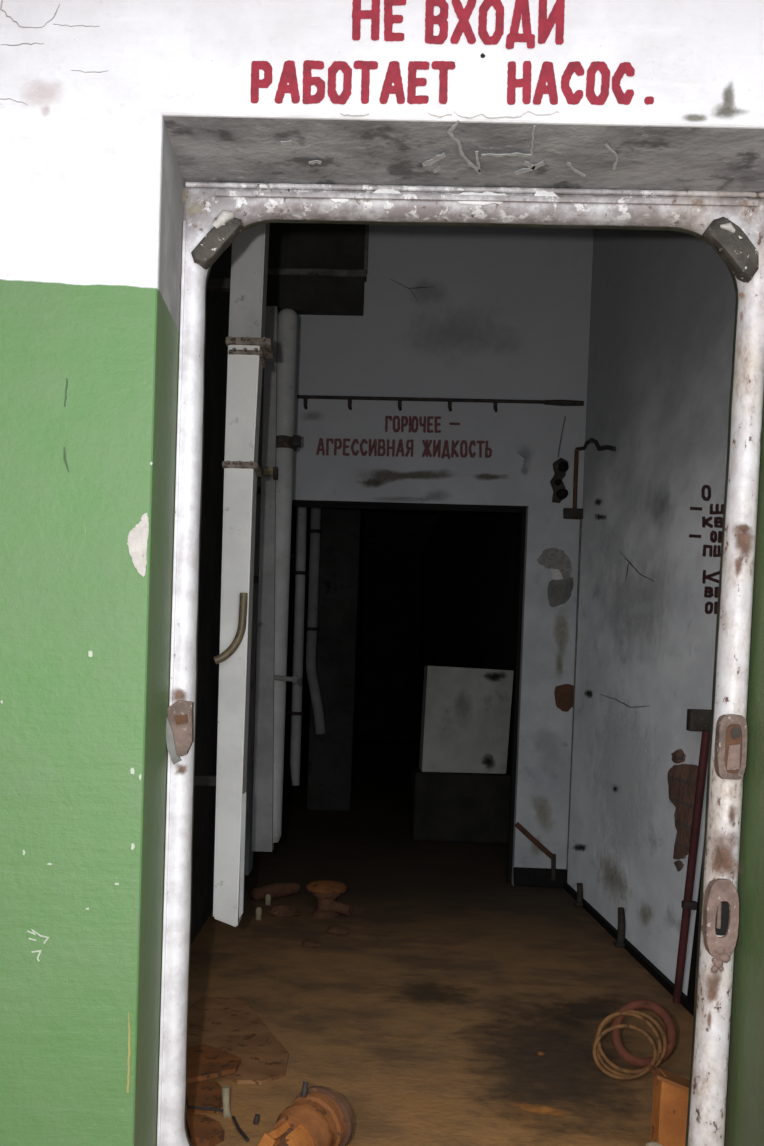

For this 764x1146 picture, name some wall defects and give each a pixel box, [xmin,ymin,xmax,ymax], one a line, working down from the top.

crack [0,0,99,46]
peeling [127,513,149,577]
spalling [537,548,574,607]
rust [735,525,752,574]